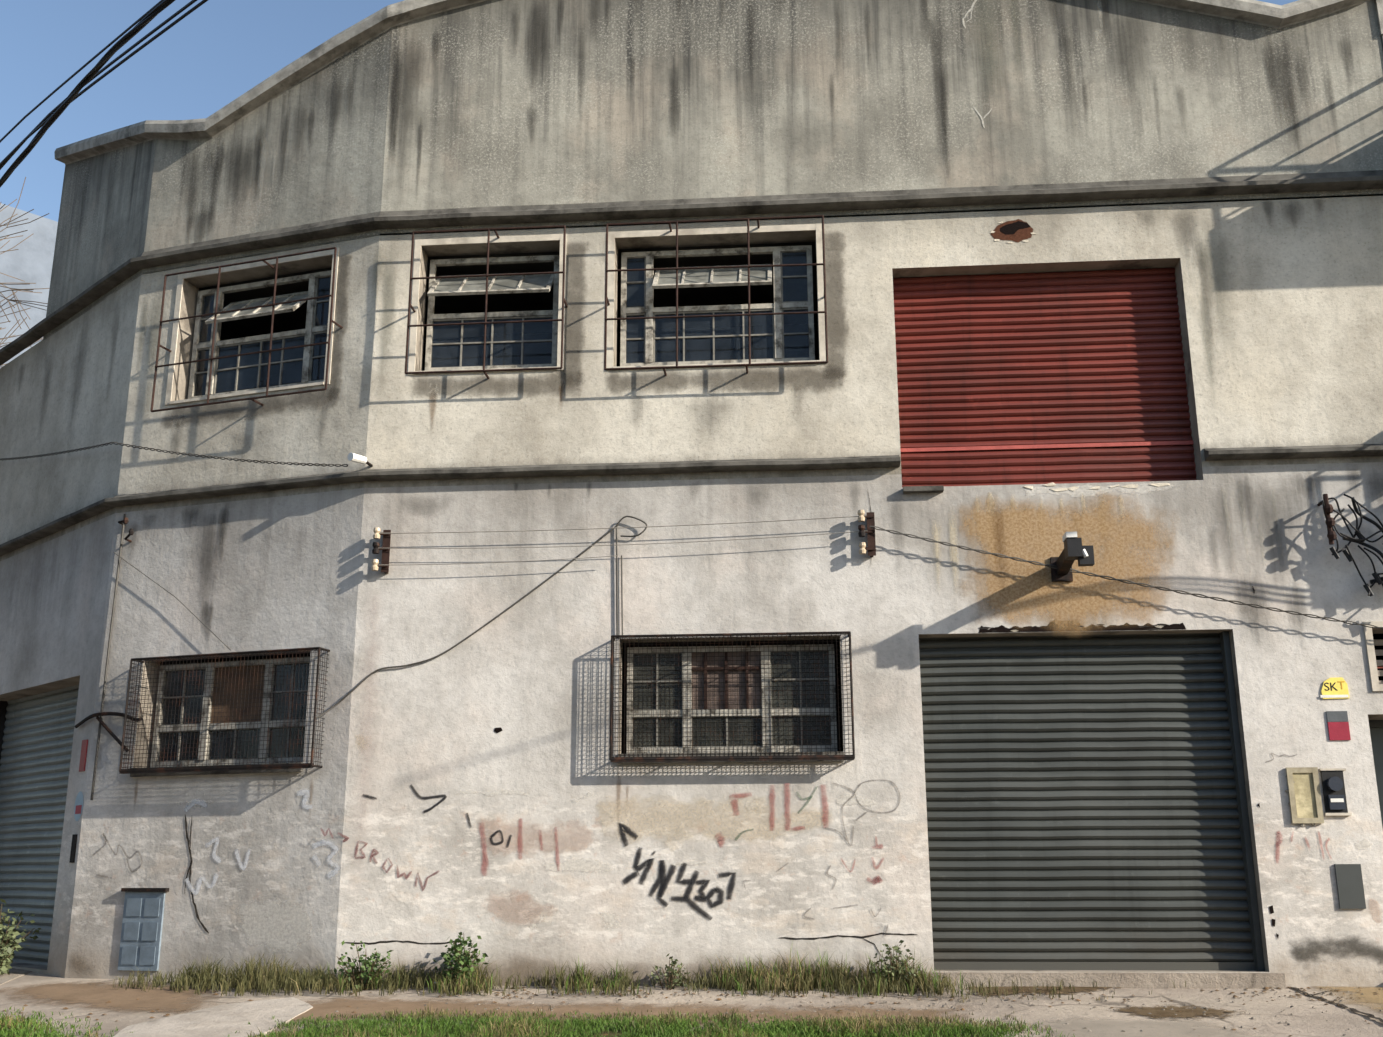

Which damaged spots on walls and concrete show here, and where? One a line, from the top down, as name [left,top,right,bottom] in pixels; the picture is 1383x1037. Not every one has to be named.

crack [962,0,977,28]
peeling [1024,482,1173,497]
spalling [979,621,1186,633]
water stain [1293,938,1383,962]
crack [1290,987,1383,1022]